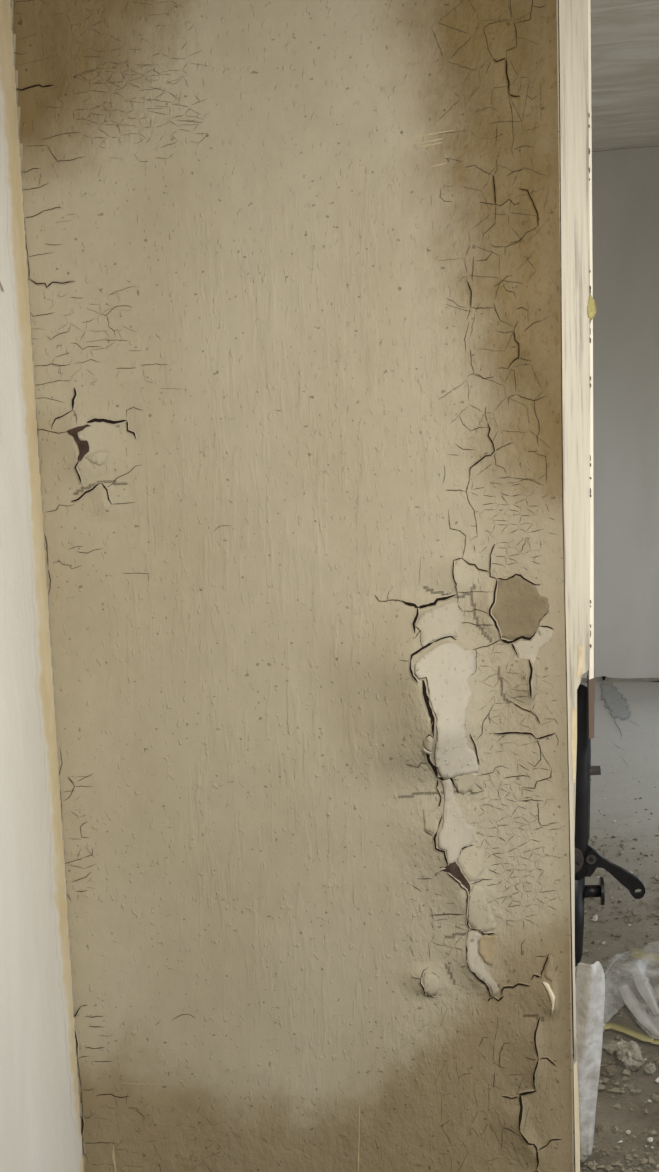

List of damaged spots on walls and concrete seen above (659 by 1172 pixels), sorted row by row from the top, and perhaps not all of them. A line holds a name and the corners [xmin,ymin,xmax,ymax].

damp [0,0,214,1172]
damp [78,904,573,1172]
peeling [415,601,500,997]
damp [359,0,568,832]
crack [375,0,562,1172]
peeling [515,627,553,664]
peeling [542,954,555,1013]